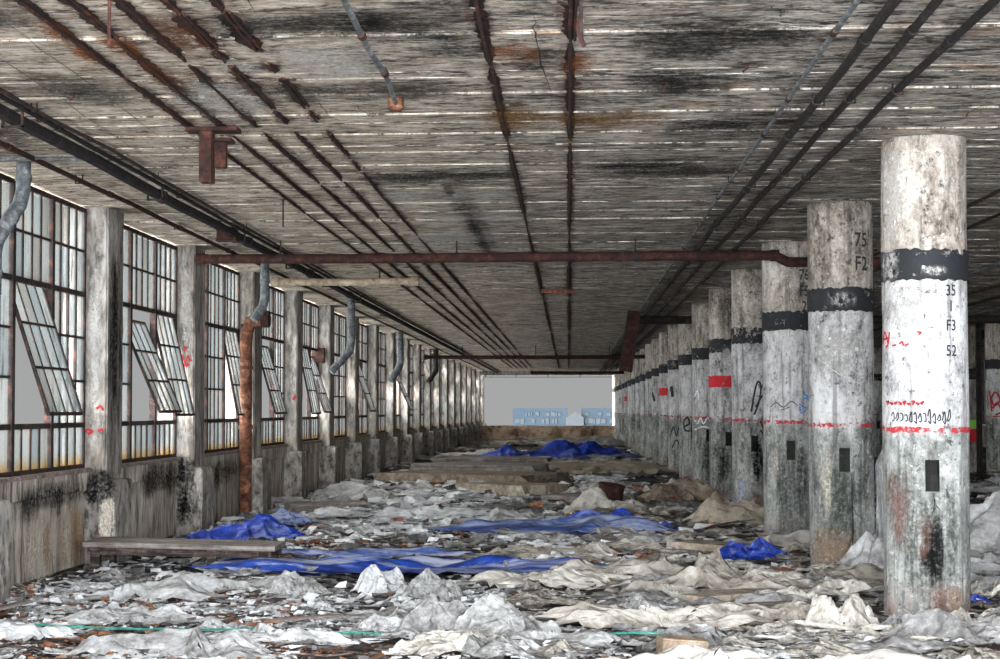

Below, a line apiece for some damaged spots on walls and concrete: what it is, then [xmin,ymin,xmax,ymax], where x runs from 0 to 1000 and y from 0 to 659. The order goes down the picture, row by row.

damp [626,15,815,94]
damp [143,462,197,525]
damp [822,451,864,532]
damp [908,498,956,593]